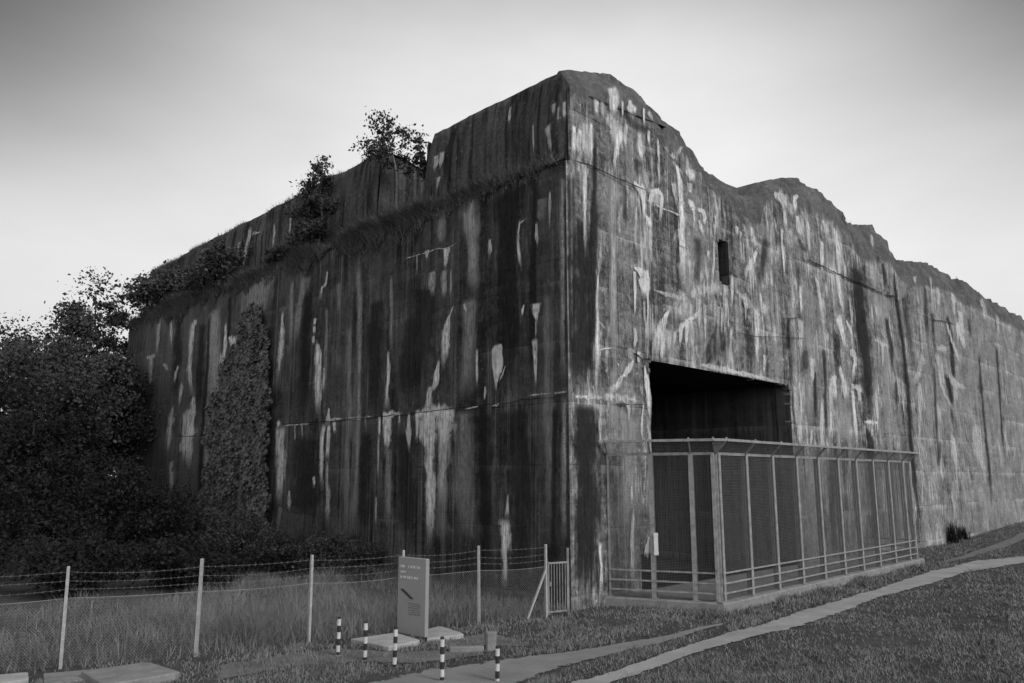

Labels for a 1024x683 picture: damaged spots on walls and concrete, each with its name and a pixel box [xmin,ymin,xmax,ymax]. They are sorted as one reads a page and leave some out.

leakage [595,88,659,172]
leakage [431,211,450,278]
leakage [463,198,479,279]
leakage [672,166,716,275]
leakage [147,268,270,495]
leakage [276,273,486,523]
efflorescence [655,306,699,356]
leakage [775,193,919,534]
leakage [925,291,971,457]
leakage [979,359,992,490]
leakage [996,349,1004,445]
leakage [479,410,532,576]